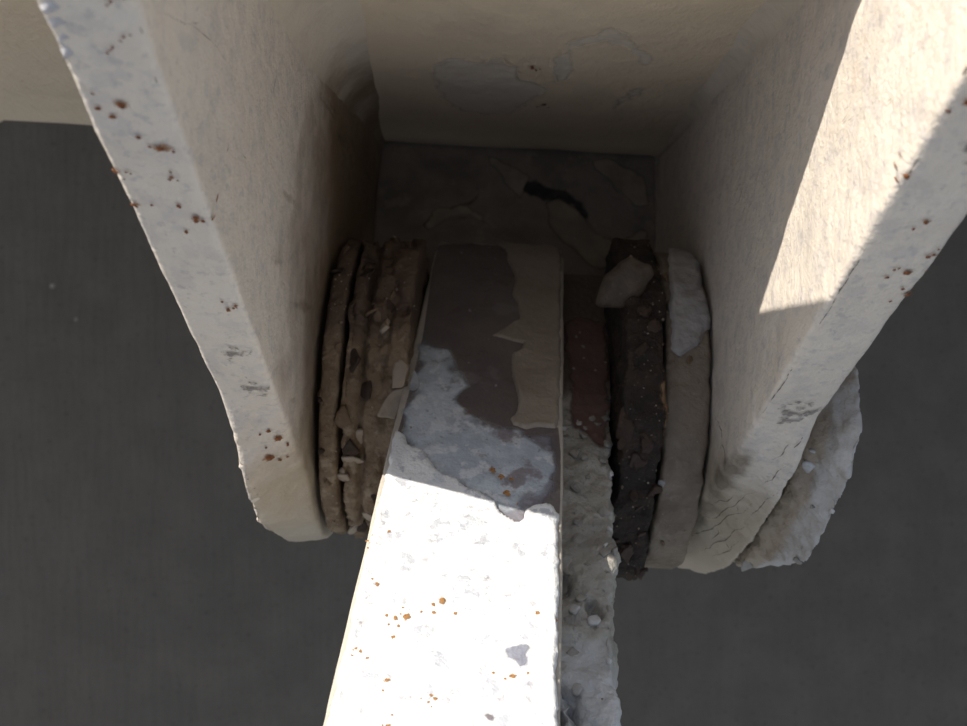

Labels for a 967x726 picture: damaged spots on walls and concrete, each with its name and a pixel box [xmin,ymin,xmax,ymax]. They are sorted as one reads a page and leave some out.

rust [94,102,127,119]
rust [135,136,175,153]
peeling [377,243,561,522]
rust [259,429,290,461]
crack [692,441,801,556]
rust [385,597,445,639]